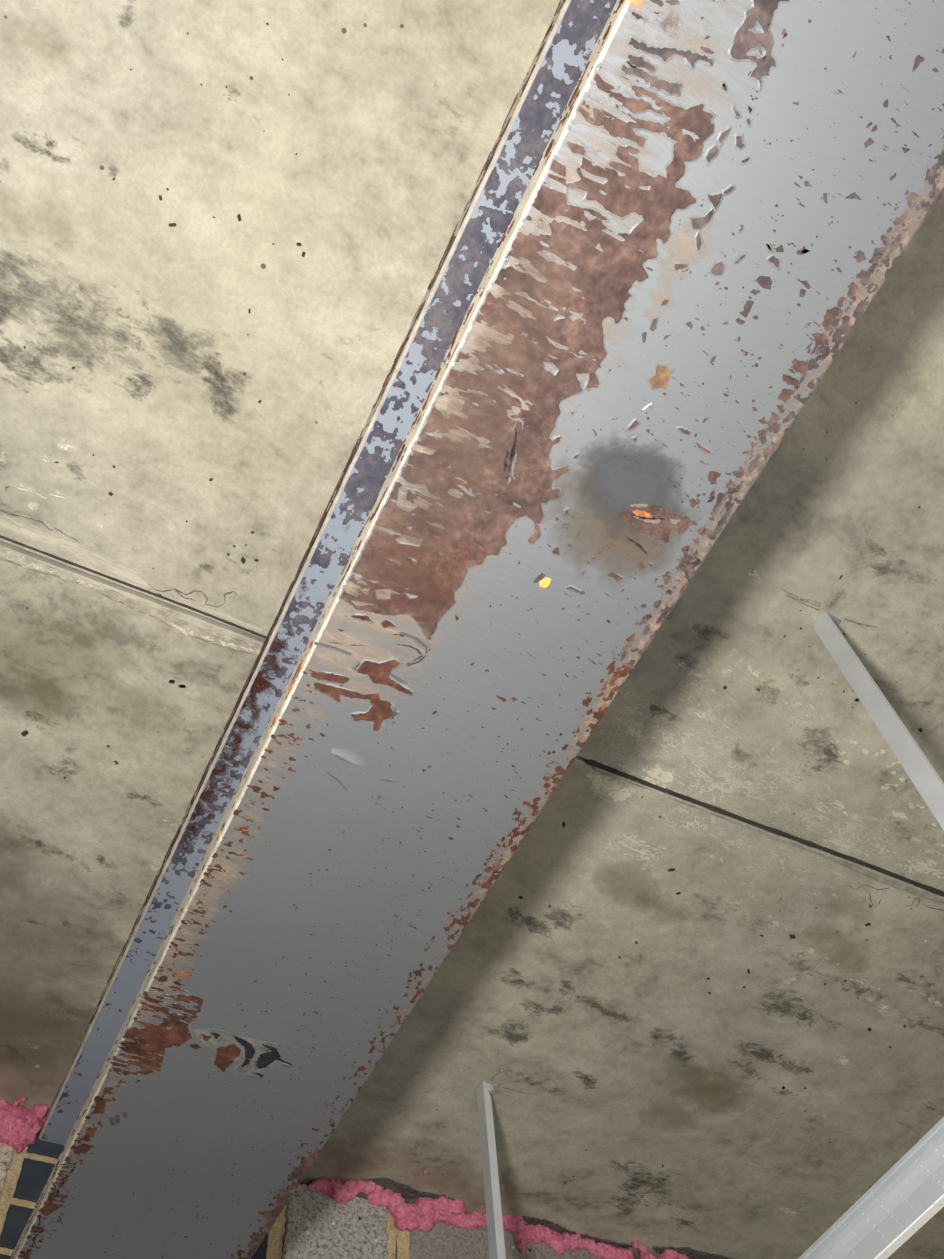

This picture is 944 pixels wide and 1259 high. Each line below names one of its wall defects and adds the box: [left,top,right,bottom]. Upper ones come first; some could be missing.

corrosion [533,0,642,175]
peeling [912,55,939,73]
peeling [864,122,878,148]
leakage [0,254,39,322]
peeling [797,279,821,297]
leakage [151,319,242,411]
peeling [0,0,791,966]
corrosion [10,0,566,1259]
corrosion [231,150,944,1259]
leakage [508,908,571,933]
leakage [494,1024,528,1043]
peeling [42,1054,88,1139]